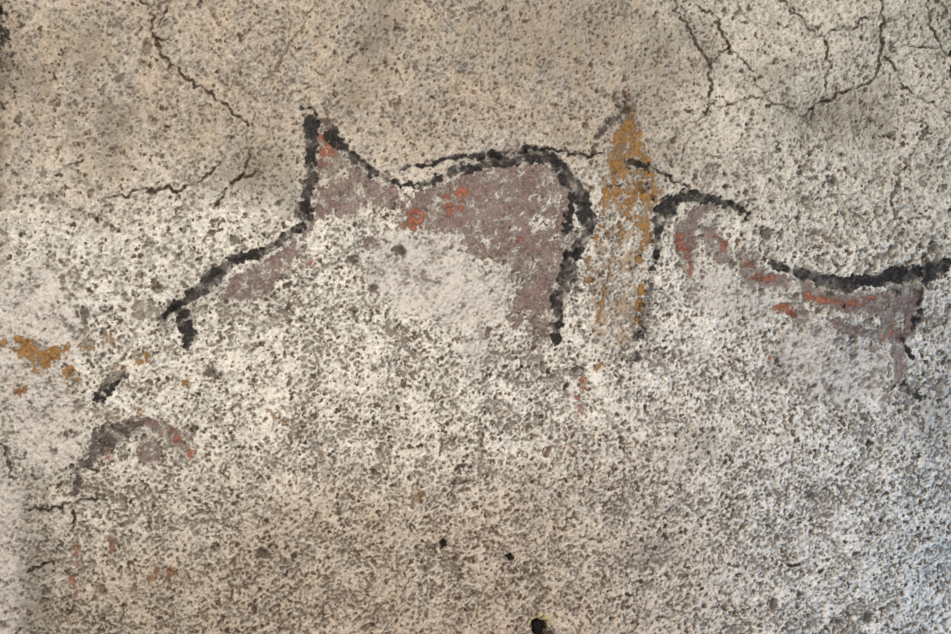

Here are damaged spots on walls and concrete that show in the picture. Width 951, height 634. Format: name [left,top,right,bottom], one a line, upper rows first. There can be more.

crack [139,0,249,127]
crack [674,0,951,216]
crack [106,152,258,207]